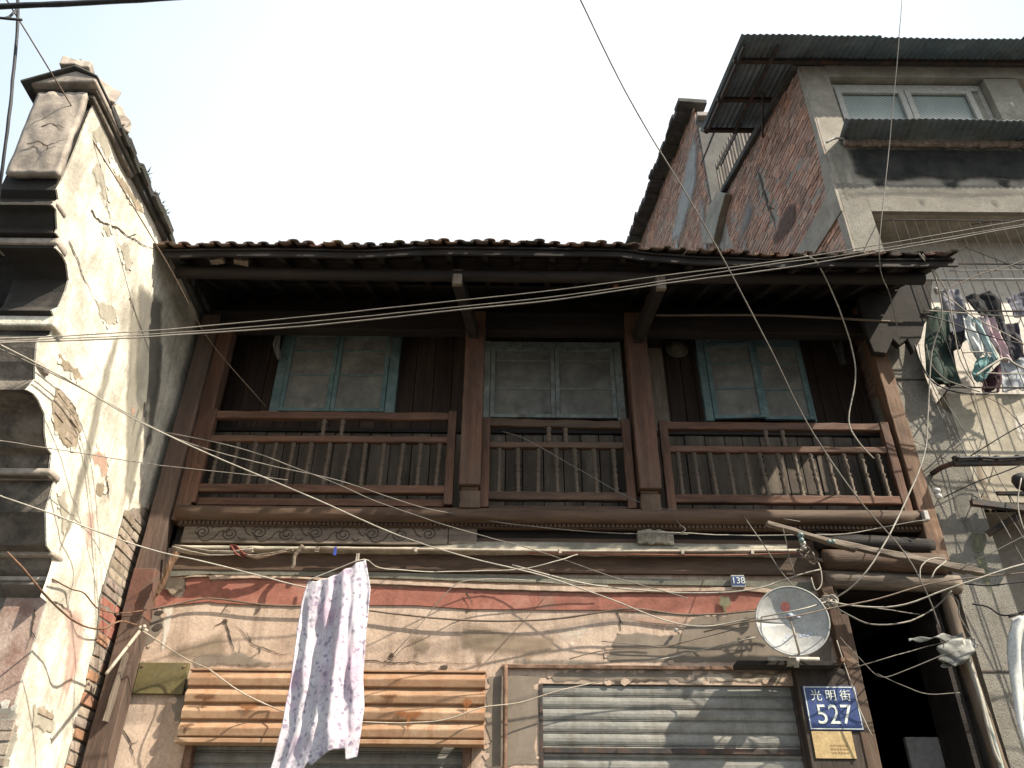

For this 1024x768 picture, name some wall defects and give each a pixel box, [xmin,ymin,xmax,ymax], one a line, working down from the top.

crack [27,123,67,154]
peeling [93,127,145,213]
damp [833,148,1024,204]
crack [91,193,152,248]
peeling [95,295,119,329]
peeling [58,354,85,387]
spalling [52,388,82,453]
crack [214,605,284,666]